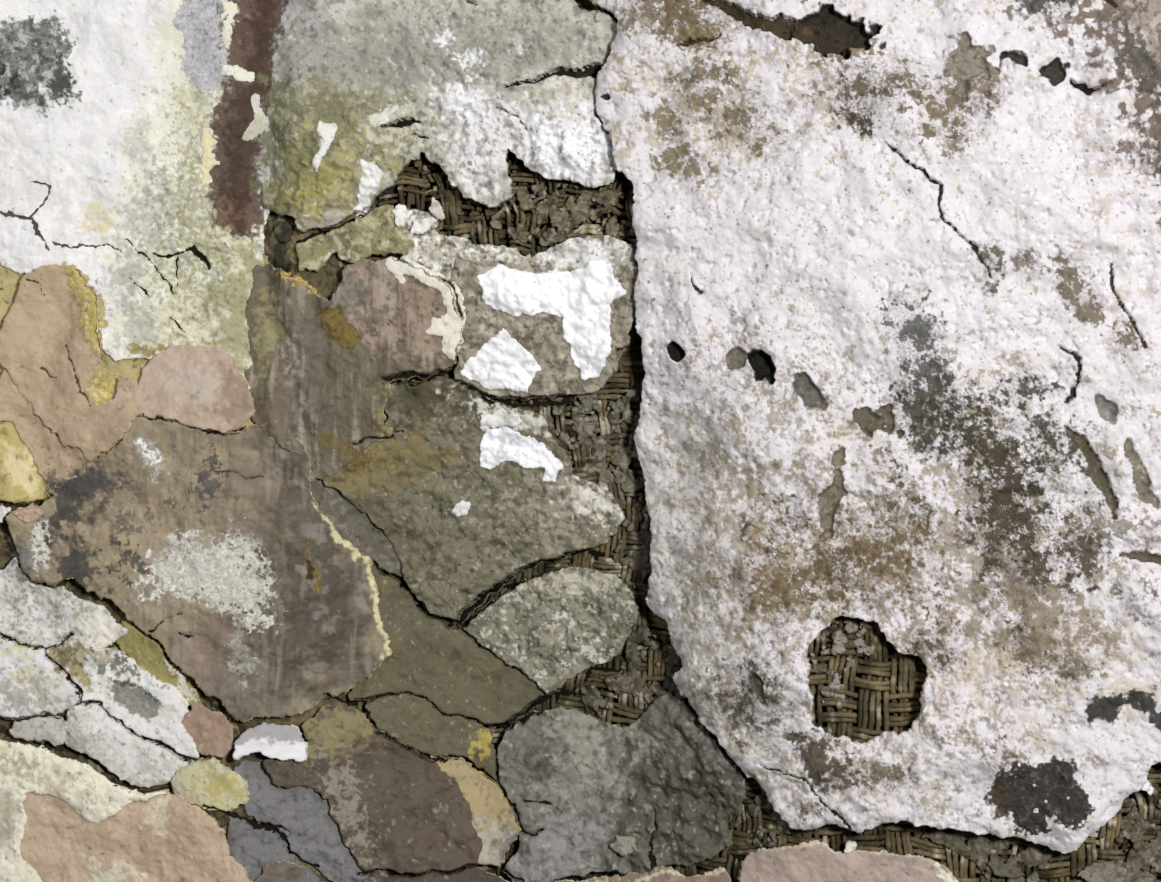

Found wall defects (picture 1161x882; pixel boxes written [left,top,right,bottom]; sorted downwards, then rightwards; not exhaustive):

water stain [0,10,82,118]
crack [0,181,210,333]
flaking render [392,197,445,235]
peeling [384,255,541,393]
peeling [477,260,627,380]
crack [884,141,992,279]
crack [1060,346,1082,403]
crack [1109,263,1147,348]
peeling [479,408,564,482]
peeling [0,264,522,875]
water stain [705,658,911,821]
water stain [977,734,1095,838]